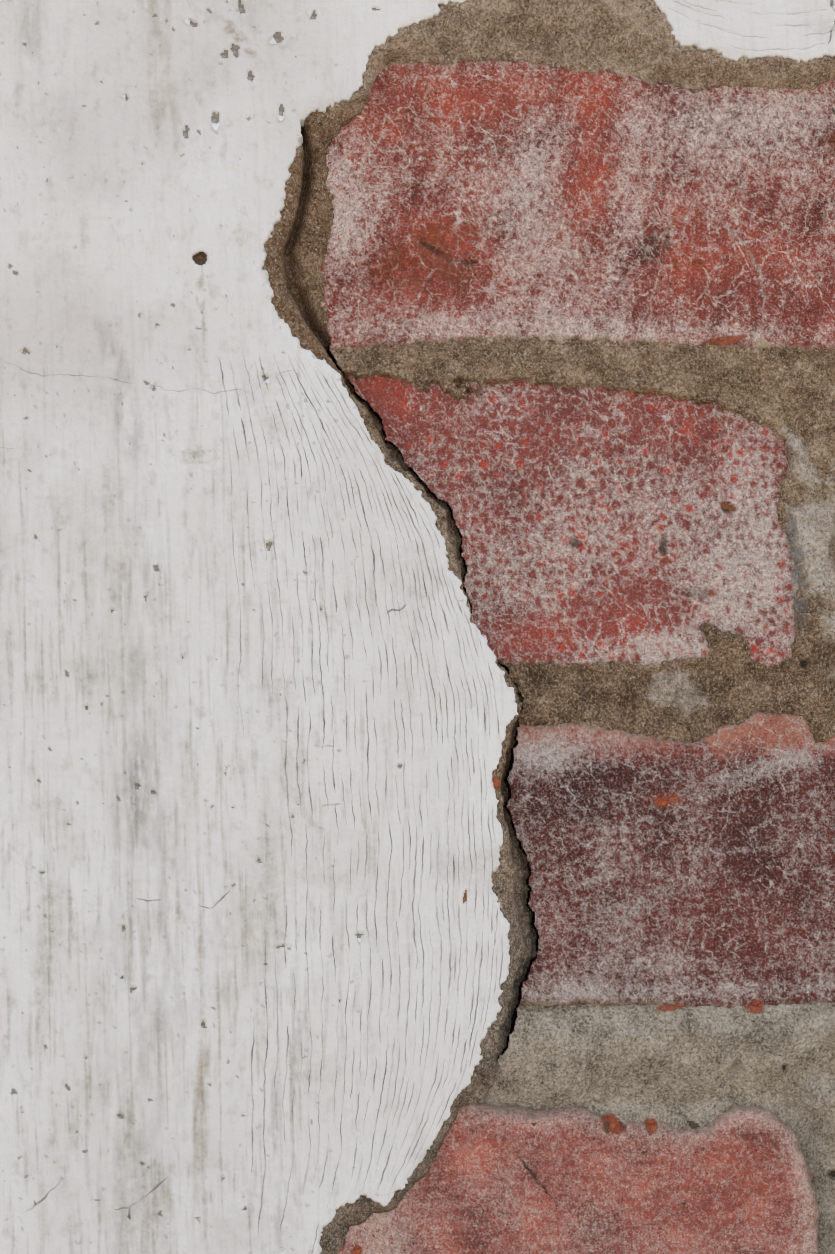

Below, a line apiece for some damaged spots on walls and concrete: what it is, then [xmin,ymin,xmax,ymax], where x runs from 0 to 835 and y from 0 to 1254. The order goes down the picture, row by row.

spalling [262,0,835,1254]